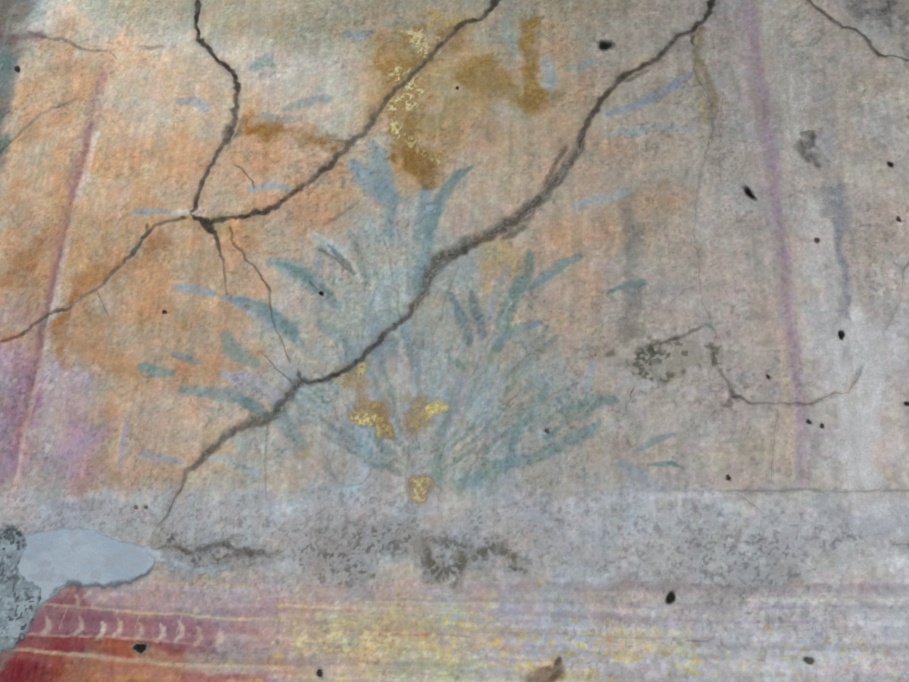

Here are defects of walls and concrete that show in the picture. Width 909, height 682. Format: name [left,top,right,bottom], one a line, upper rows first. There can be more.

crack [808,0,887,57]
crack [0,0,499,341]
crack [192,0,714,468]
flaking render [632,338,721,381]
hole [131,643,147,654]